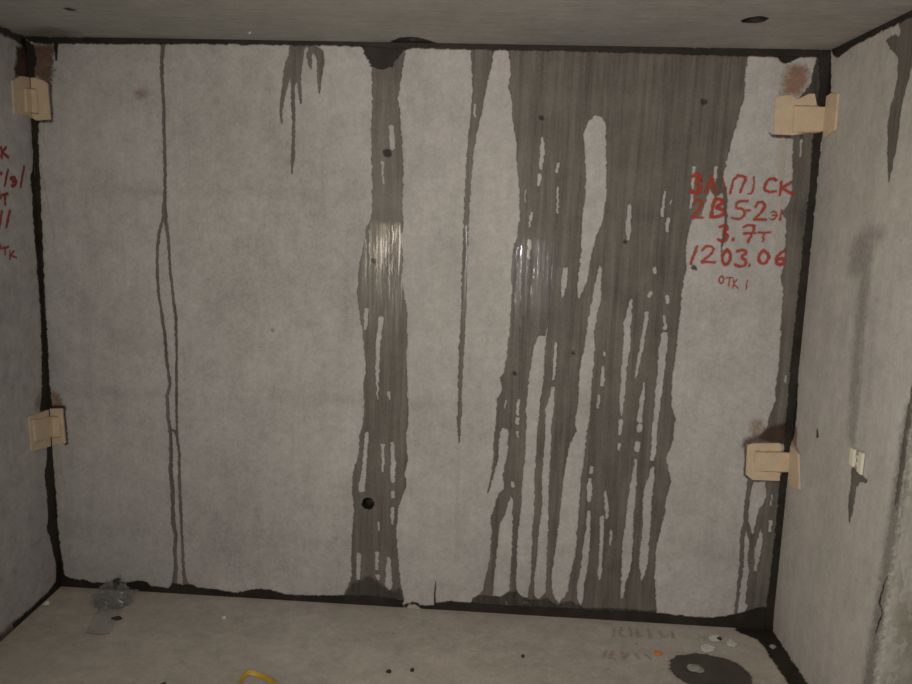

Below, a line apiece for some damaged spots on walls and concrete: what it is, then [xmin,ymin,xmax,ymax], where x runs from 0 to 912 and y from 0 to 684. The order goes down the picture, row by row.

rust [14,35,54,123]
water stain [279,45,325,174]
rust [784,66,806,93]
water stain [886,17,912,181]
water stain [156,44,189,585]
water stain [344,37,435,602]
water stain [457,49,494,442]
water stain [471,50,748,613]
water stain [766,133,814,444]
rust [744,425,786,482]
water stain [734,477,780,614]
water stain [669,653,752,684]